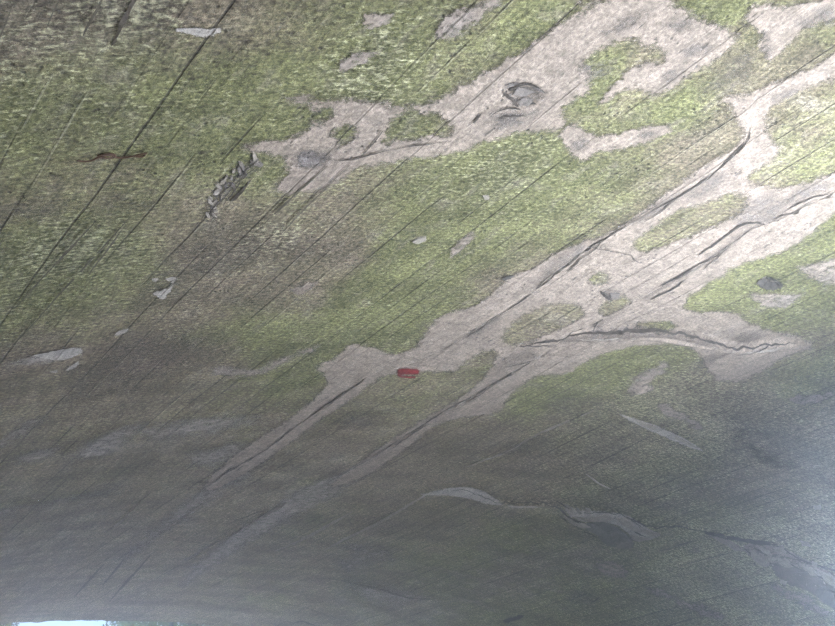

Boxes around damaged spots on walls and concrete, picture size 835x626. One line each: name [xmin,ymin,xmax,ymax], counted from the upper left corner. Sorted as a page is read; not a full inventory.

peeling [176,27,222,38]
peeling [744,0,835,60]
peeling [205,0,740,219]
damp [152,277,178,300]
peeling [204,52,835,491]
crack [445,125,752,349]
crack [651,191,835,300]
damp [21,348,83,373]
crack [323,306,796,485]
peeling [420,486,501,505]
spalling [557,504,660,549]